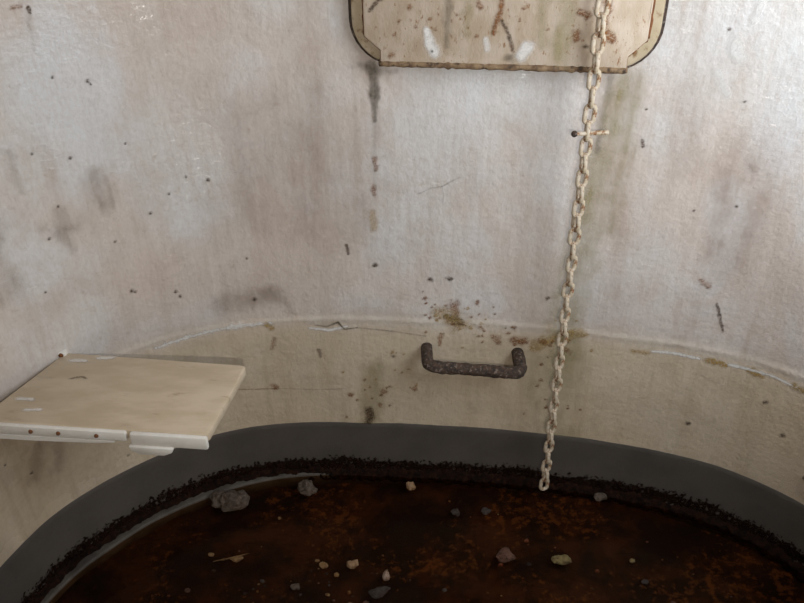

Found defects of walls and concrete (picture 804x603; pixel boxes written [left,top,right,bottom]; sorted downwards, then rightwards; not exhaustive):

leakage [369,67,378,106]
corrosion [423,291,501,344]
corrosion [505,320,588,352]